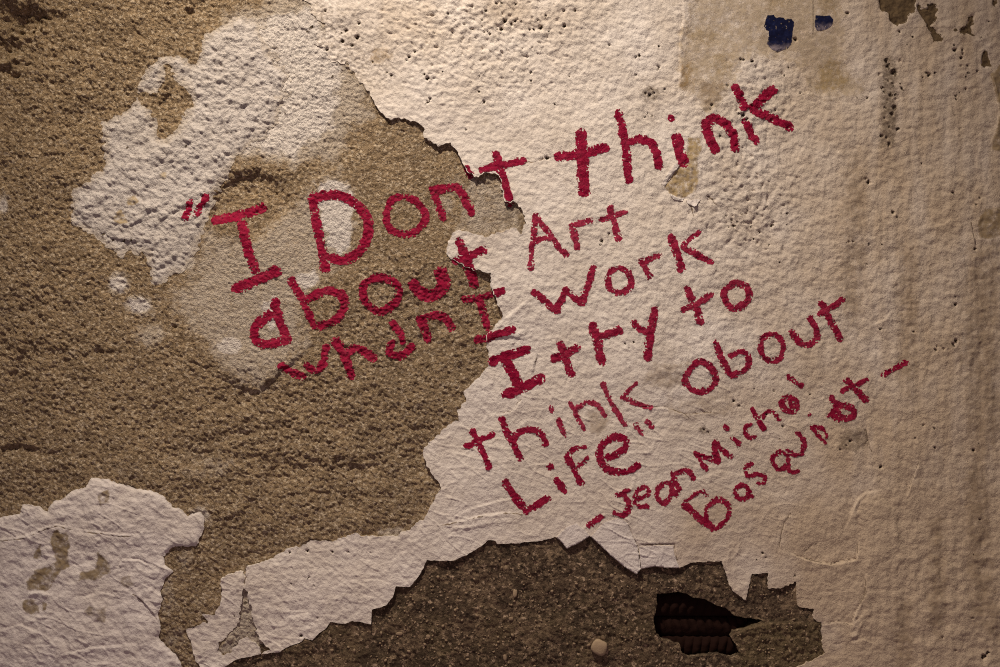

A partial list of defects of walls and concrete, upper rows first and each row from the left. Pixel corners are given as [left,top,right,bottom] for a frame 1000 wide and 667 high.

flaking render [879,0,1000,103]
peeling [661,138,701,207]
flaking render [0,0,526,667]
flaking render [218,518,825,667]